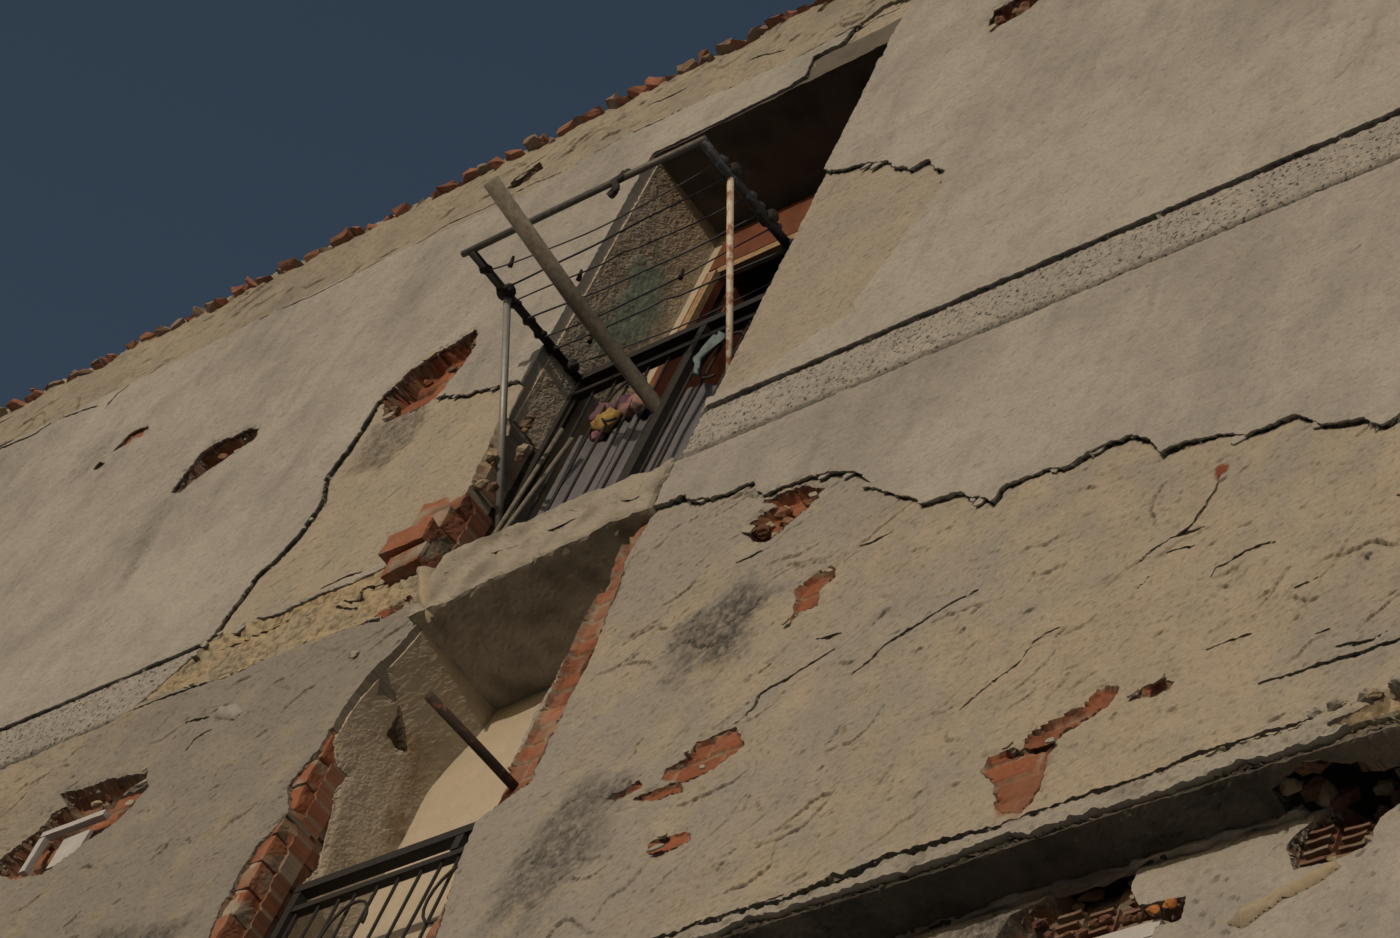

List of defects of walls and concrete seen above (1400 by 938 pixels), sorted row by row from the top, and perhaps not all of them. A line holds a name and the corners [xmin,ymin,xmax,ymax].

flaking render [0,334,536,938]
flaking render [426,419,1400,938]
crack [1174,518,1205,551]